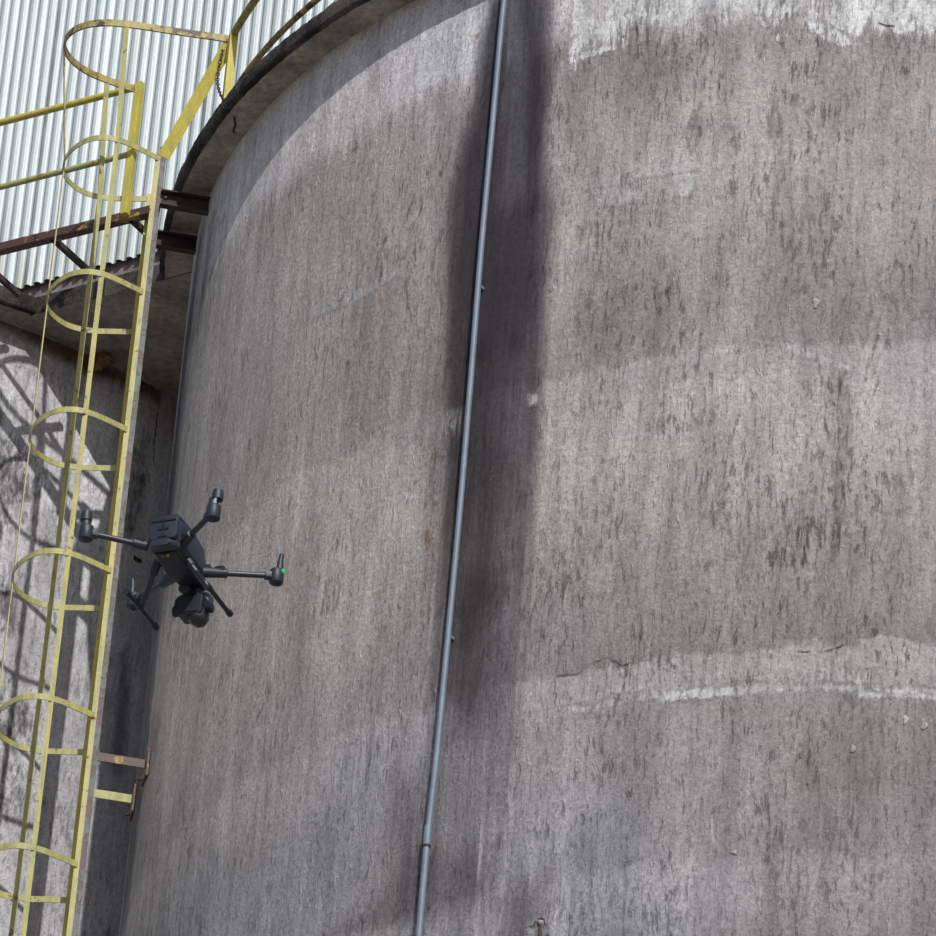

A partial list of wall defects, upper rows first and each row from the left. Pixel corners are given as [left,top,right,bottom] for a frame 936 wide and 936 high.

damp [569,0,936,71]
damp [643,686,762,702]
damp [823,685,936,700]